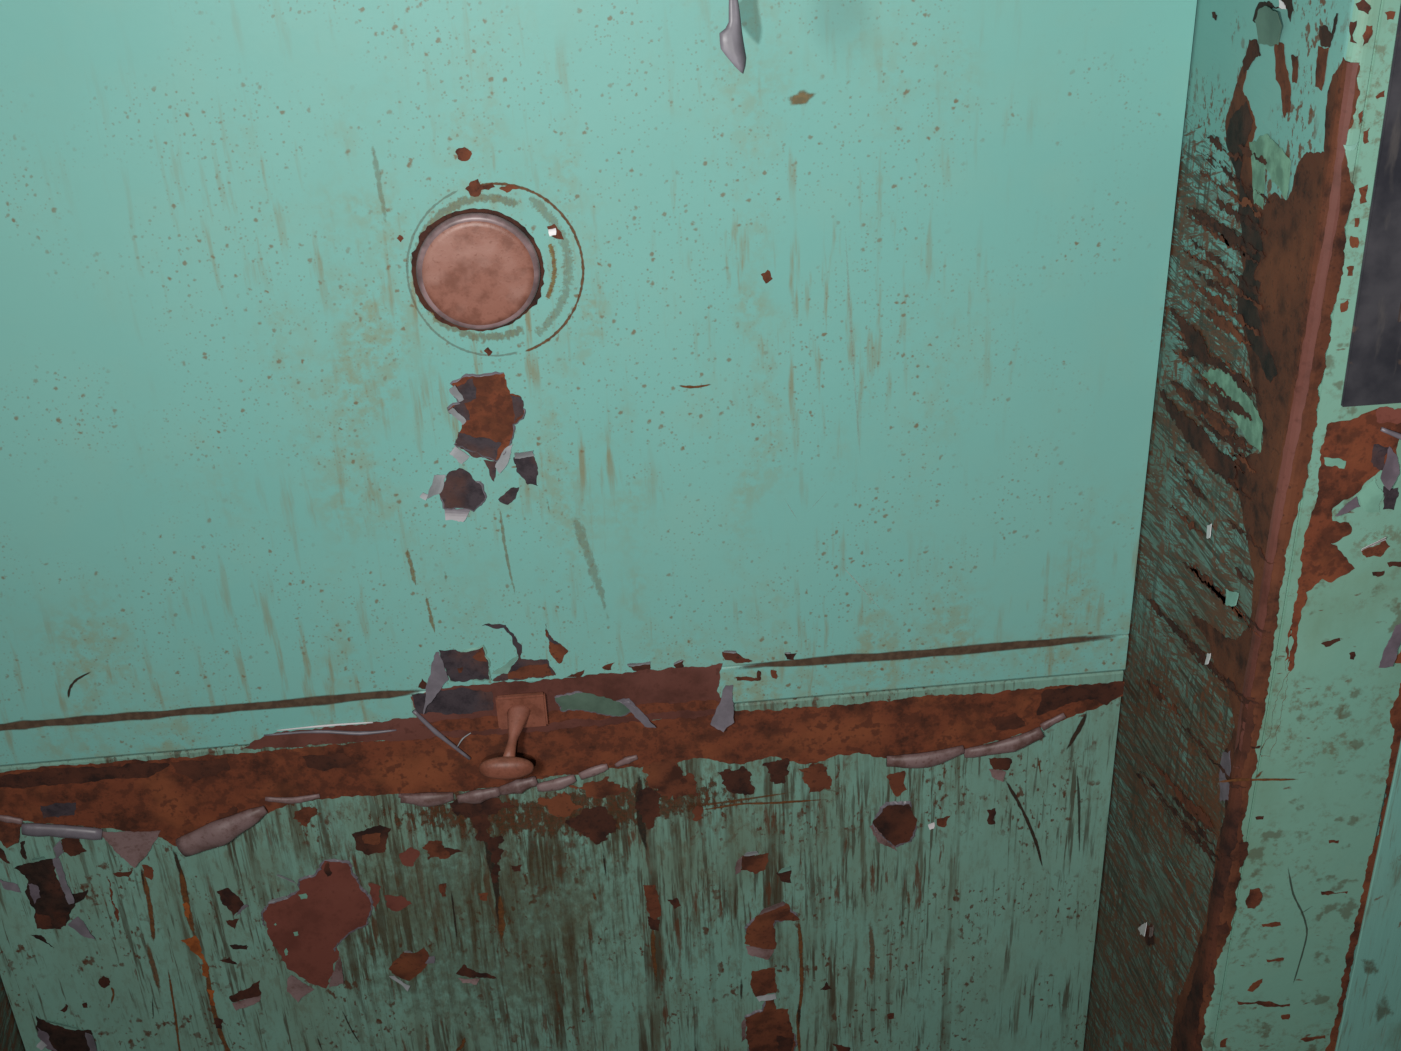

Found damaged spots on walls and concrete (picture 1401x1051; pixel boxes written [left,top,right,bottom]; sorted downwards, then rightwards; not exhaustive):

corrosion [1349,185,1368,248]
peeling [420,371,538,522]
peeling [1136,0,1401,1051]
peeling [36,1004,97,1051]
corrosion [0,691,418,731]
corrosion [293,807,334,827]
peeling [217,825,420,1002]
peeling [0,623,1124,948]
corrosion [365,758,832,938]
peeling [741,901,800,1051]
corrosion [744,636,1109,668]
corrosion [1237,979,1290,1020]